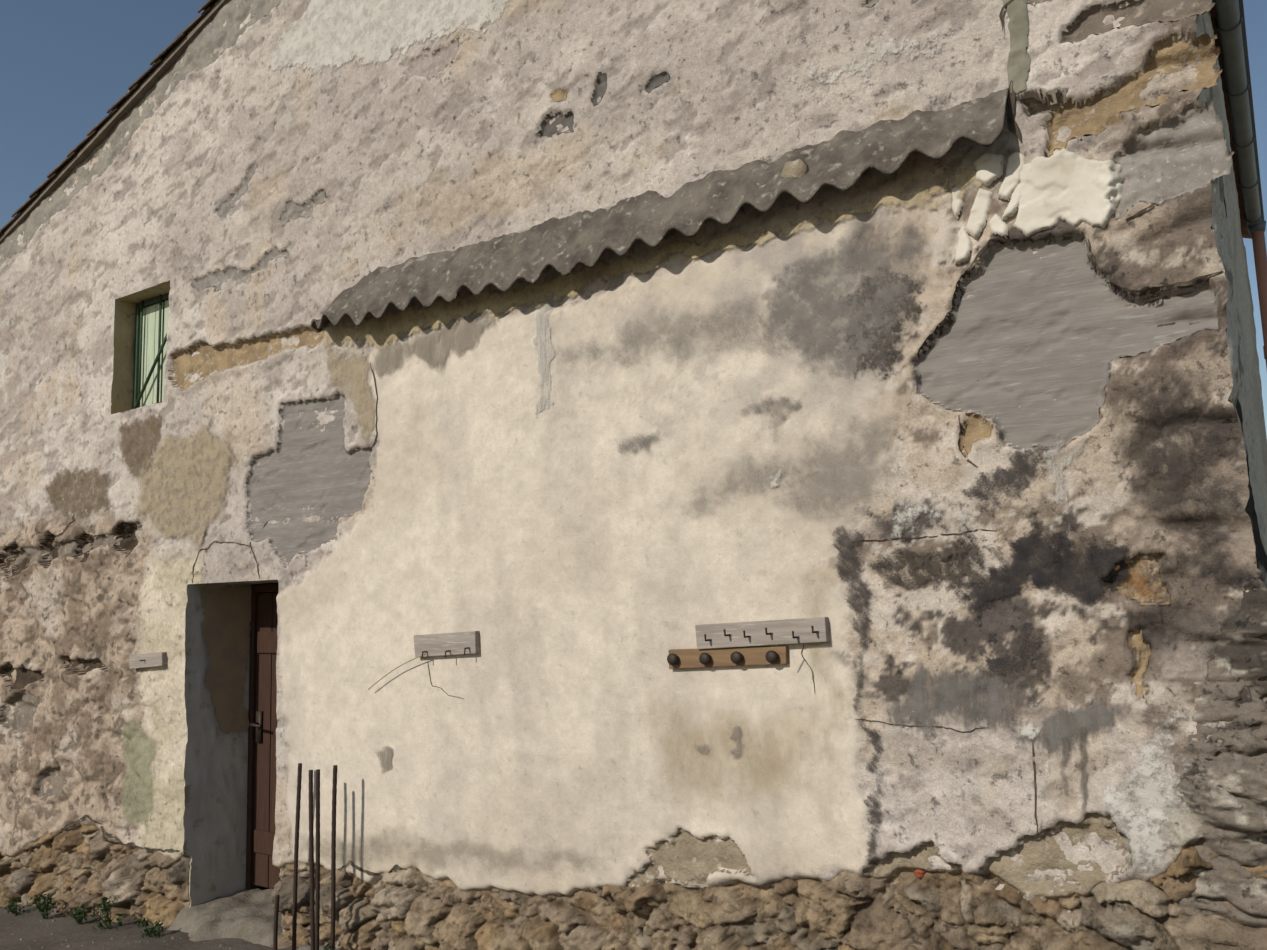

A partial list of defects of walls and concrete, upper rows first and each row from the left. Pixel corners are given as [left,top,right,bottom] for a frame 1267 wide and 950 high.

crack [999,0,1030,141]
peeling [952,0,1234,264]
leakage [323,168,982,443]
flaking render [959,413,992,457]
leakage [1125,366,1249,582]
leakage [832,436,1157,772]
flaking render [625,828,753,888]
leakage [863,785,882,867]
leakage [887,622,1119,809]
leakage [1101,710,1186,872]
leakage [1222,686,1267,732]